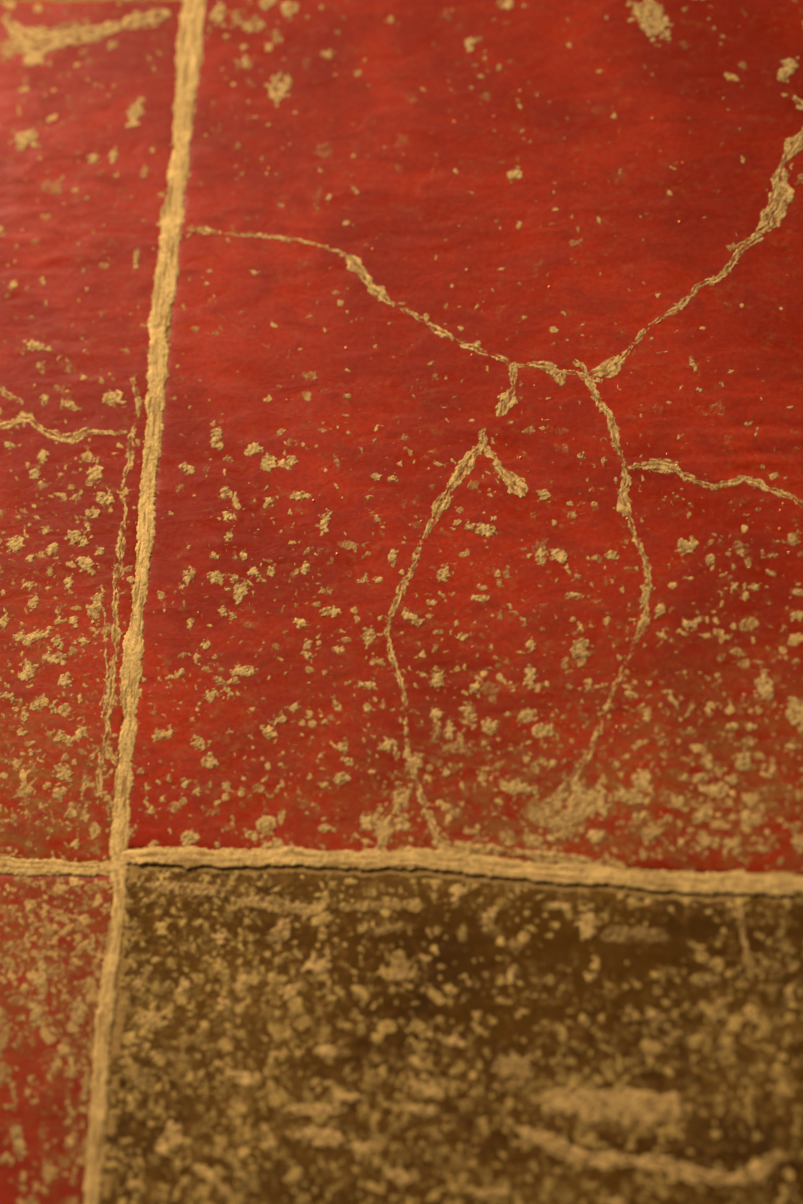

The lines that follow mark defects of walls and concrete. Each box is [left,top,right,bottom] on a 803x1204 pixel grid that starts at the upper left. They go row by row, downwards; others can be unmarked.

spalling [210,427,298,473]
crack [187,95,803,852]
spalling [0,457,115,689]
crack [0,376,142,797]
spalling [183,551,275,620]
spalling [535,547,568,566]
spalling [203,664,258,703]
spalling [430,681,499,756]
spalling [360,756,460,846]
spalling [499,752,774,858]
damp [736,906,753,980]
damp [514,1126,781,1187]